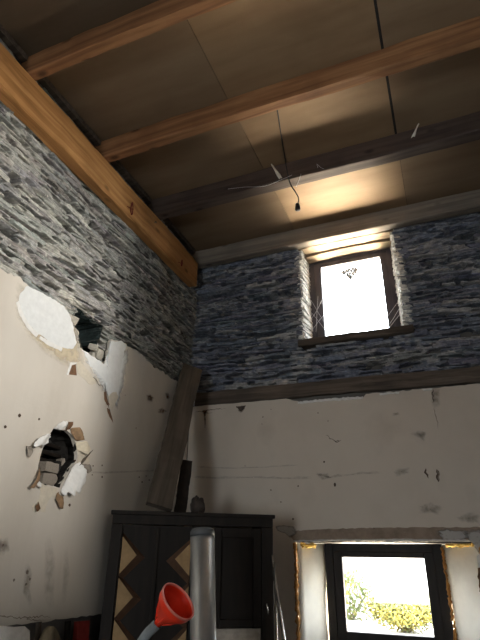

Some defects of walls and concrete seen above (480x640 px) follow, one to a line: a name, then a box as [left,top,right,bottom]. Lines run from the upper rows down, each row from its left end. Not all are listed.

flaking render [16,286,104,385]
spalling [26,421,94,512]
flaking render [290,527,480,542]